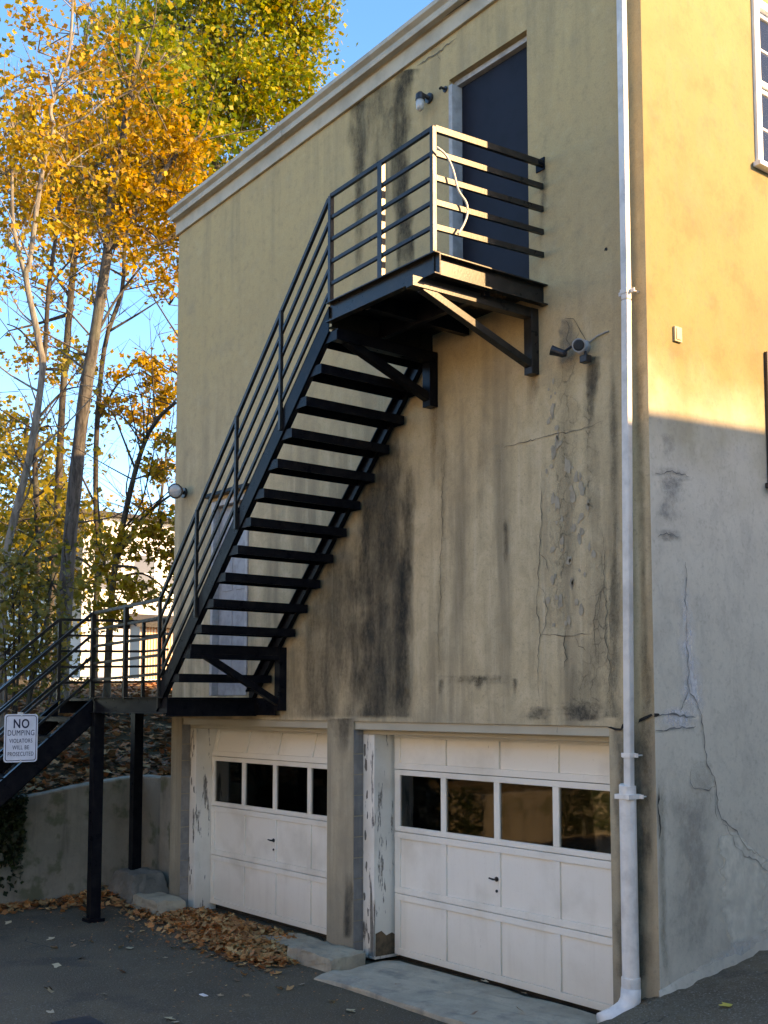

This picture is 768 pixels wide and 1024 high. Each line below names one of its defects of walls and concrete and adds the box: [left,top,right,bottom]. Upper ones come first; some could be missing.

damp [395,69,413,262]
damp [312,439,409,736]
crack [505,424,595,447]
flaking render [543,378,596,627]
crack [536,473,611,702]
damp [589,357,597,392]
crack [656,645,768,871]
peeling [363,861,395,957]